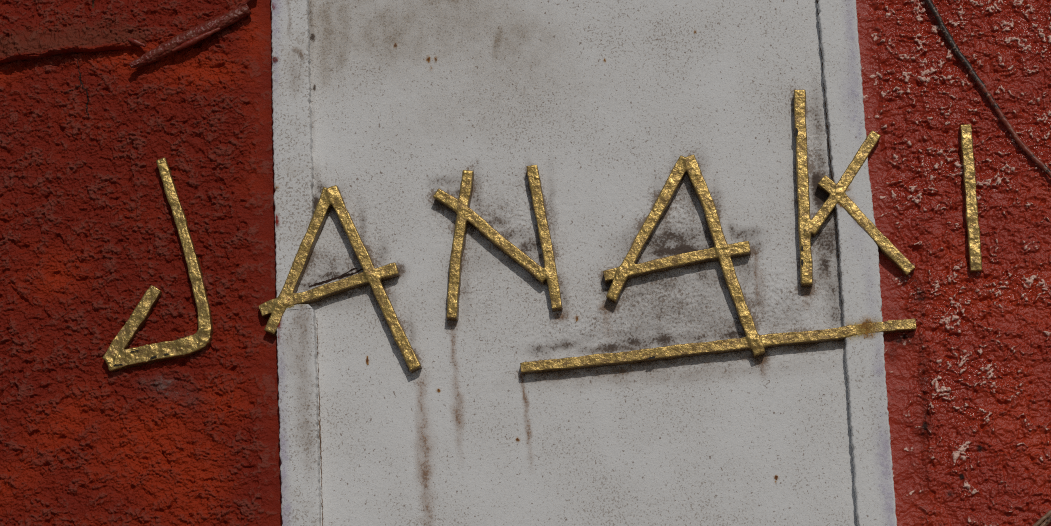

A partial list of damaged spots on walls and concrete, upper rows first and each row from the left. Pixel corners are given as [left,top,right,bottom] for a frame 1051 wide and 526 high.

rust [417,381,440,487]